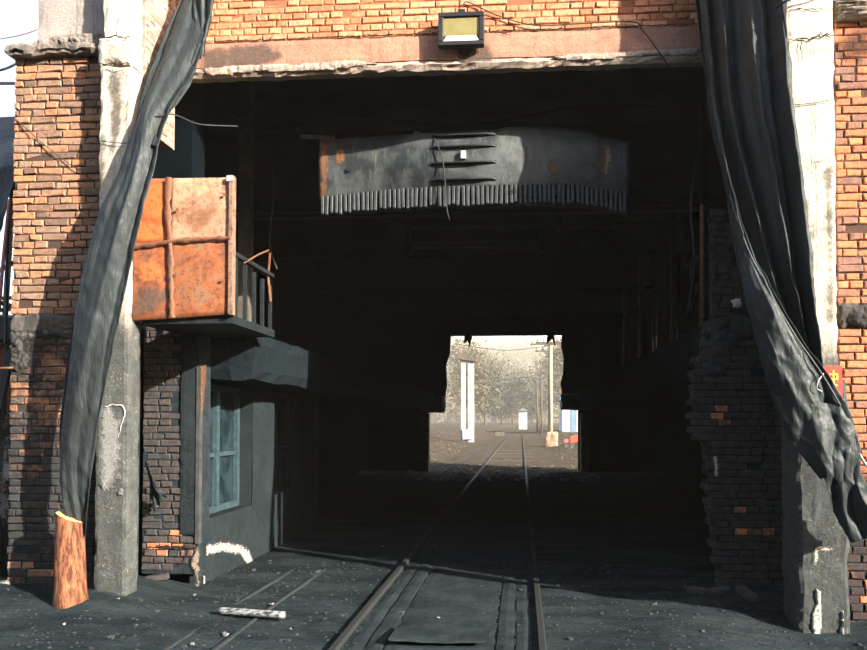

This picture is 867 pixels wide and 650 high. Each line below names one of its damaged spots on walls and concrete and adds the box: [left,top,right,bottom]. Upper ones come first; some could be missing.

crack [98,18,130,138]
water stain [202,44,282,72]
corrosion [320,143,344,196]
crack [787,8,835,307]